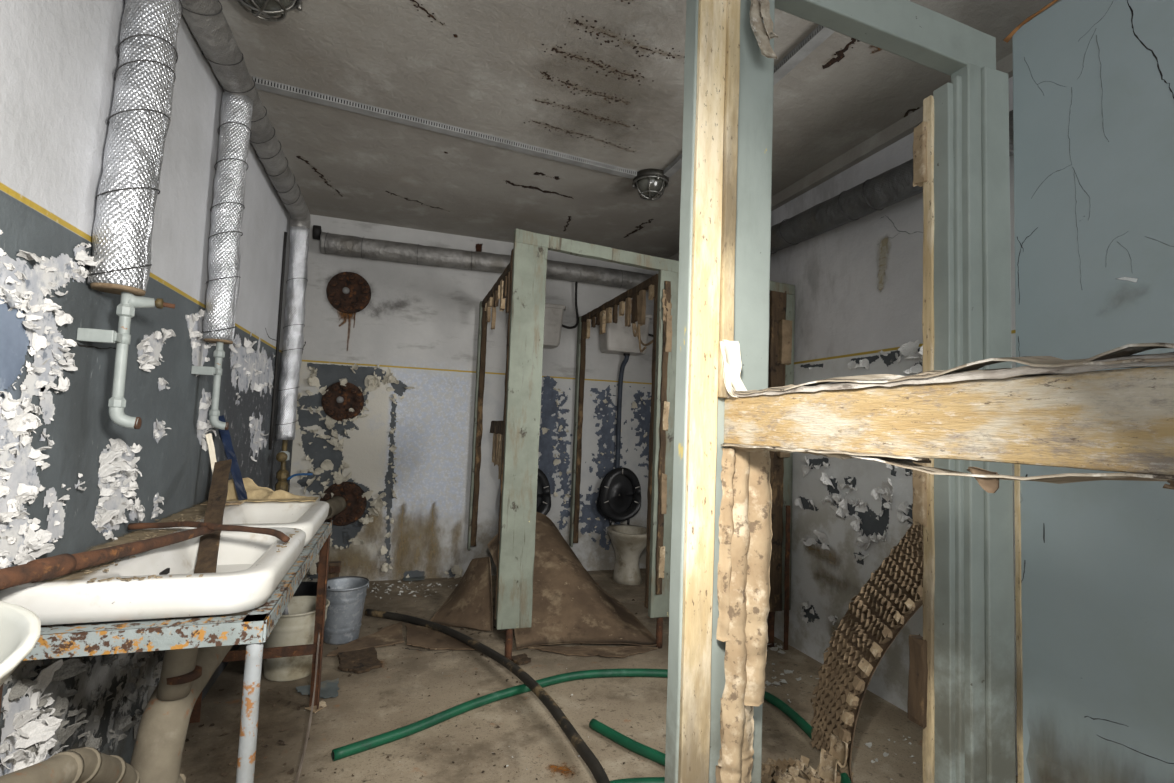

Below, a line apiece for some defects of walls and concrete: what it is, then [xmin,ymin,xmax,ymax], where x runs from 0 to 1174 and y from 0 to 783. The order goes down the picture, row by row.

crack [410,0,445,25]
crack [505,172,574,231]
crack [524,16,685,151]
crack [1024,0,1174,288]
peeling [0,243,164,569]
peeling [136,309,275,405]
corrosion [337,310,356,351]
peeling [295,363,463,599]
leakage [329,504,438,578]
peeling [538,376,651,550]
peeling [0,650,165,776]
crack [1085,716,1174,764]